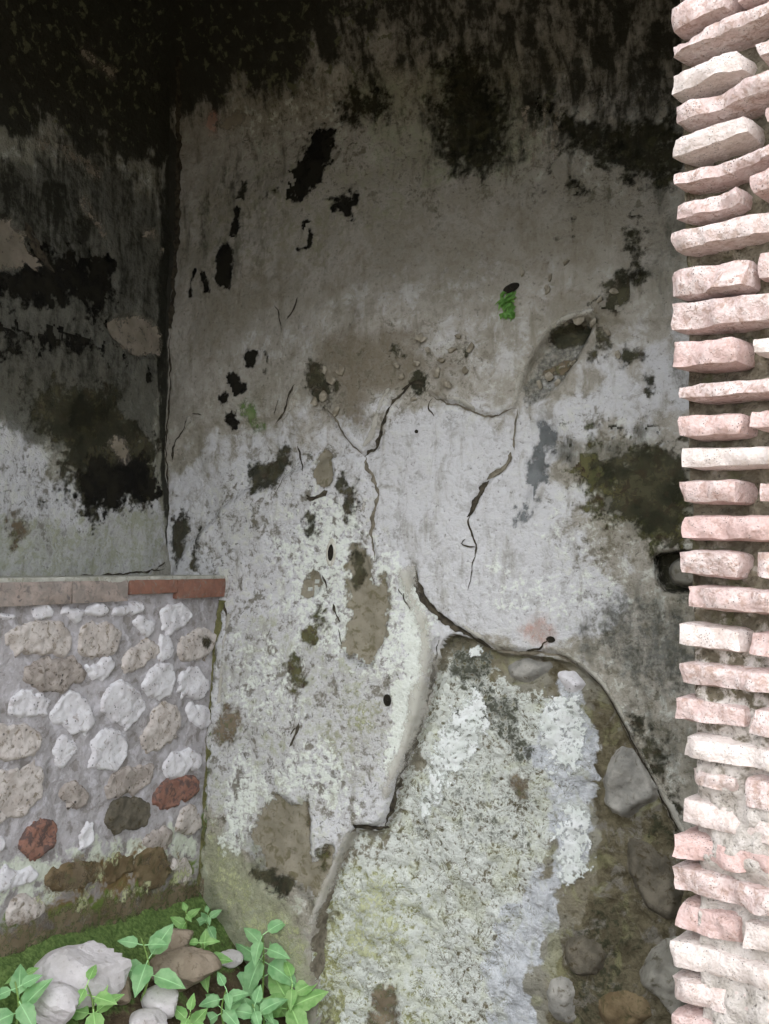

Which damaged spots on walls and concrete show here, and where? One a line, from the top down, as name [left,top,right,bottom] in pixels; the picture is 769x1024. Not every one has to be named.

damp [262,122,341,203]
damp [327,189,360,222]
damp [565,176,589,196]
damp [521,94,684,191]
damp [0,241,158,383]
peeling [513,288,619,404]
damp [18,370,165,535]
crack [273,446,328,501]
crack [327,380,518,588]
spalling [339,542,395,664]
crack [309,568,684,981]